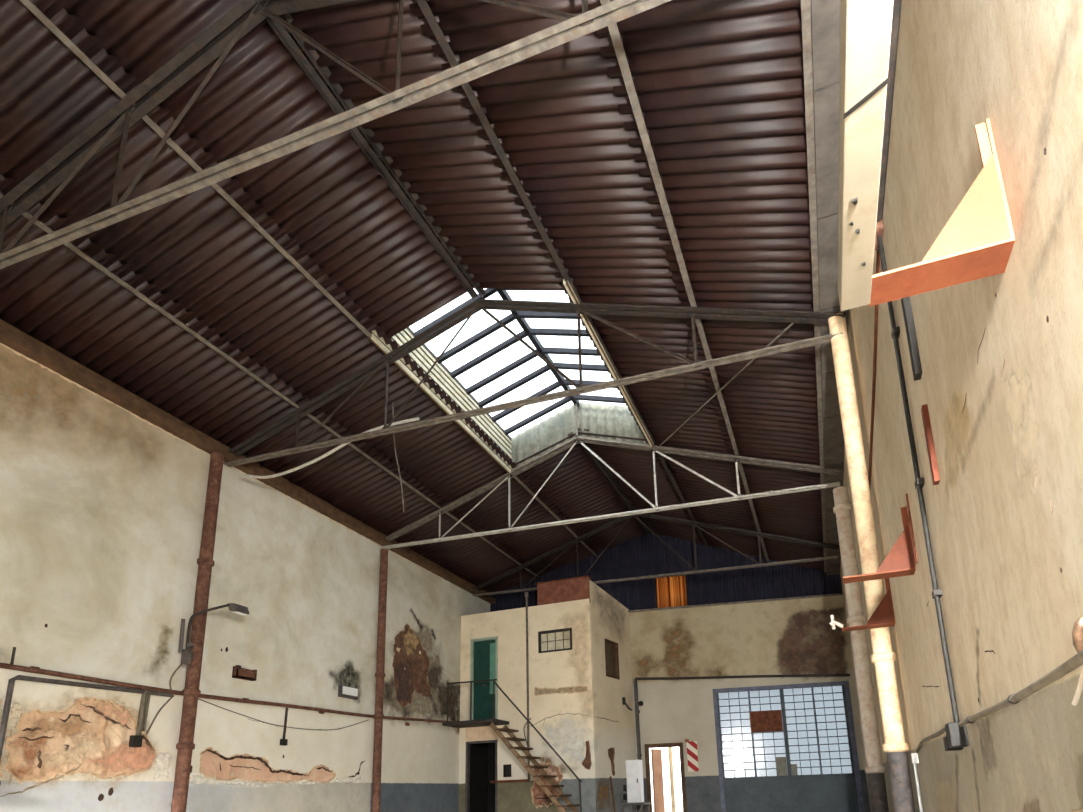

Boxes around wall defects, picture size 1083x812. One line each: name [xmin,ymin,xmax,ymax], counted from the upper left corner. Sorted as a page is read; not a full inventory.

flaking render [392,624,431,707]
flaking render [0,696,156,801]
flaking render [190,747,336,784]